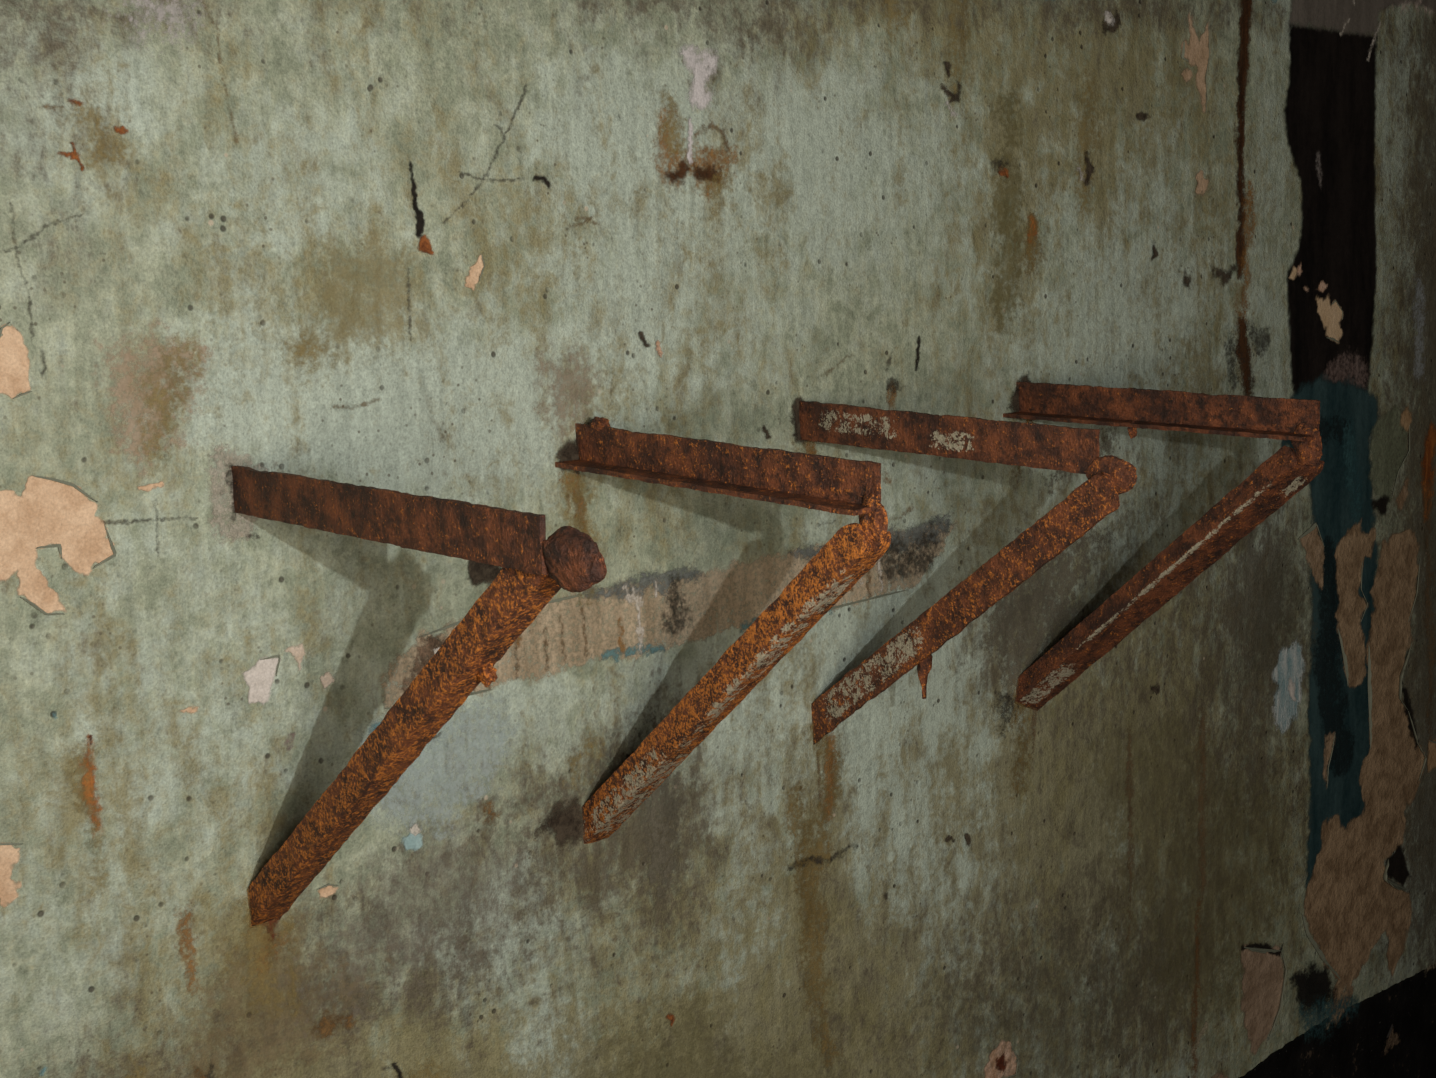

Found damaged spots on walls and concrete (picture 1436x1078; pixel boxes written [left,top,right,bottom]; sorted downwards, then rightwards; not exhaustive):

damp [990,95,1021,329]
rust [1225,0,1256,396]
peeling [0,322,32,399]
peeling [1289,264,1343,343]
peeling [0,475,117,615]
spalling [468,560,502,585]
spalling [401,620,462,692]
peeling [1299,407,1436,1029]